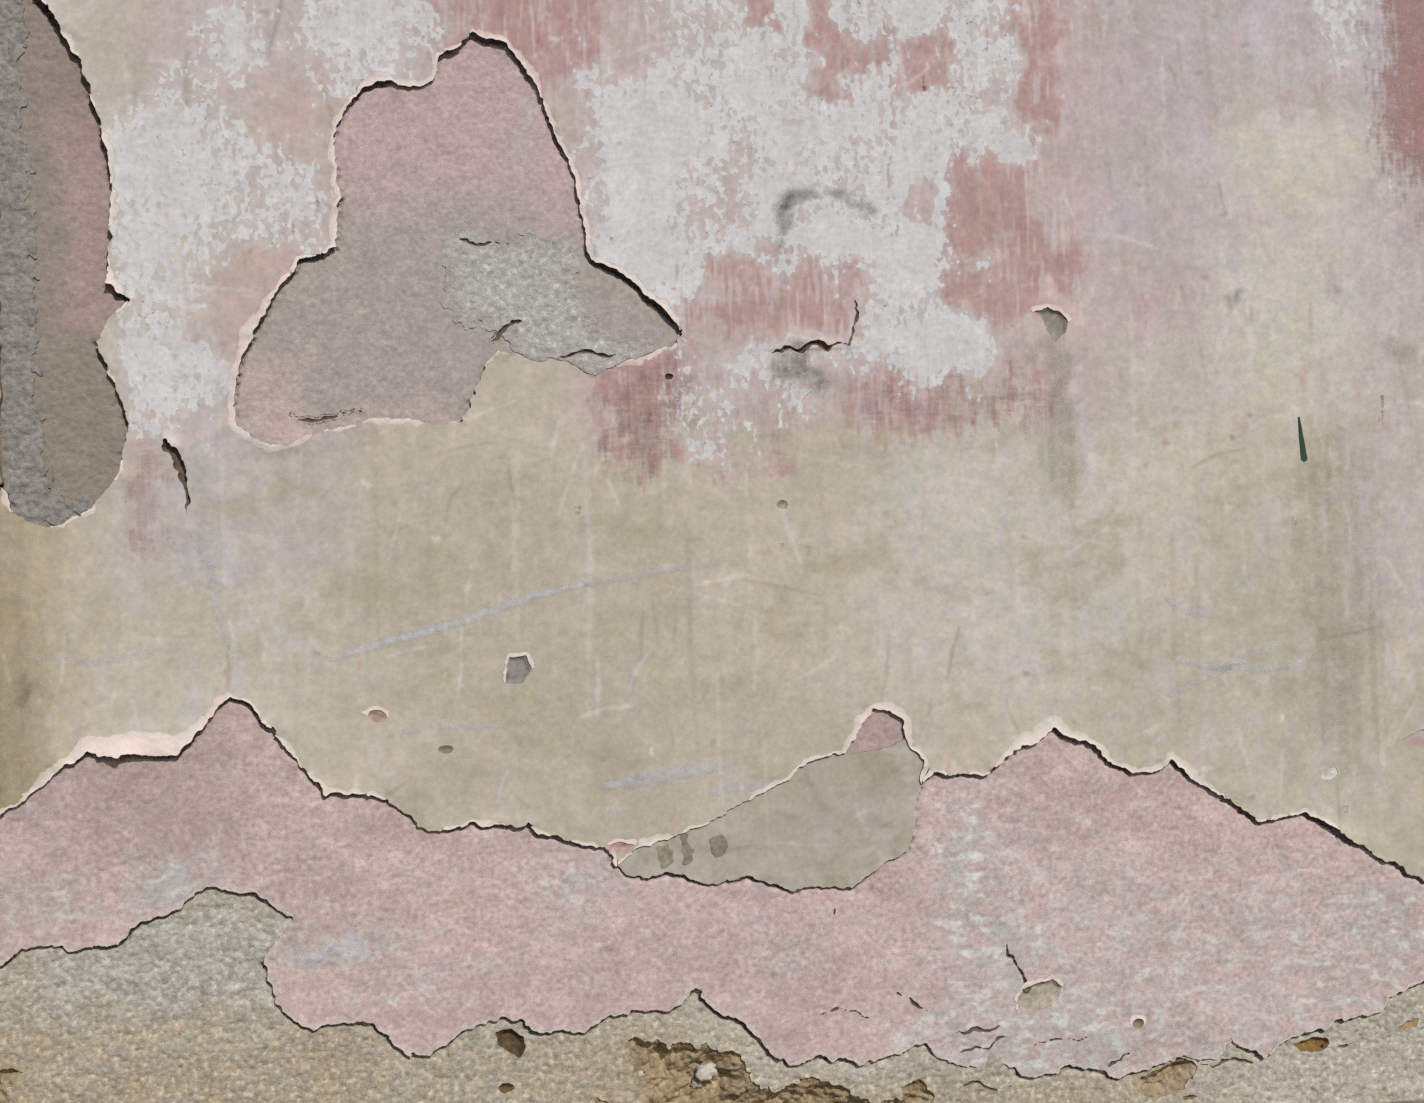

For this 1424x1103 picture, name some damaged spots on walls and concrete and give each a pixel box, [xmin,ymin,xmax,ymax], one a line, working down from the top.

crack [772,300,859,354]
peeling [1031,304,1072,342]
crack [162,438,191,512]
peeling [503,652,534,684]
peeling [0,691,1424,1103]